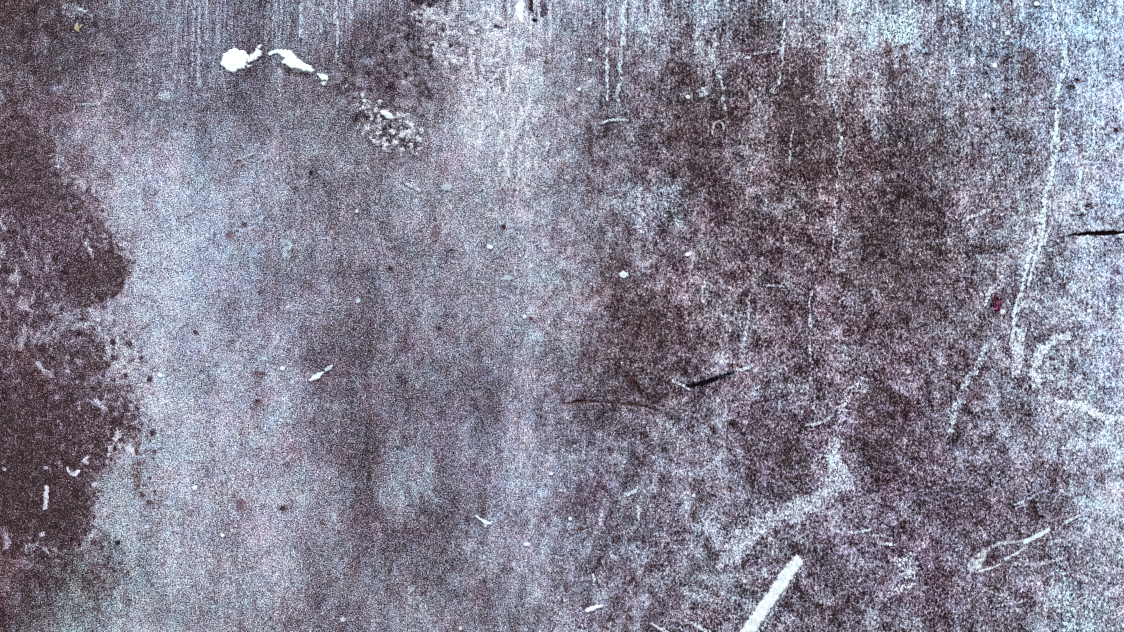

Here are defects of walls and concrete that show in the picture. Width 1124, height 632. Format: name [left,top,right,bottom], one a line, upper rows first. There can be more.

damp [786,44,817,118]
damp [877,11,923,93]
damp [1012,44,1037,123]
damp [599,146,704,244]
damp [941,343,988,441]
damp [1007,329,1124,425]
damp [716,375,874,573]
damp [87,470,158,569]
damp [542,584,588,632]
damp [886,549,922,598]
damp [1054,563,1098,632]